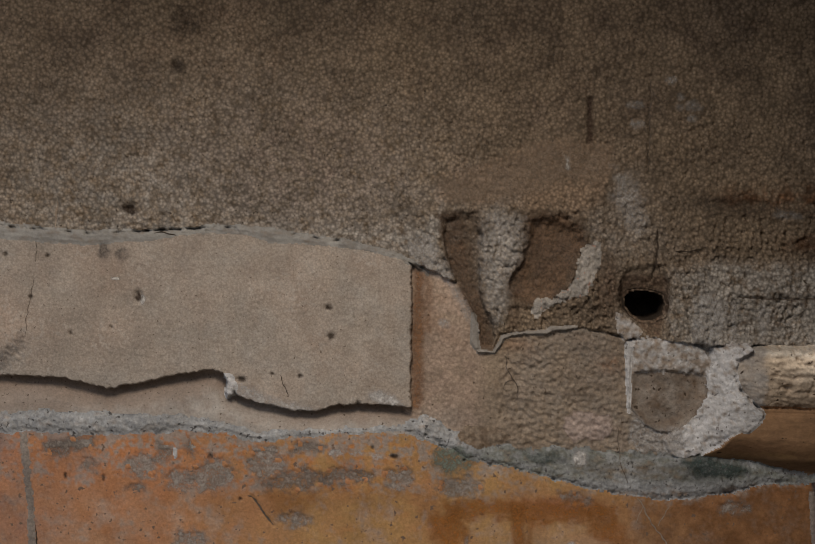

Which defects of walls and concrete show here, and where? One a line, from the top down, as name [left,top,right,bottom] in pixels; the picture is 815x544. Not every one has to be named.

spalling [439,213,492,349]
spalling [505,212,602,319]
spalling [624,335,712,434]